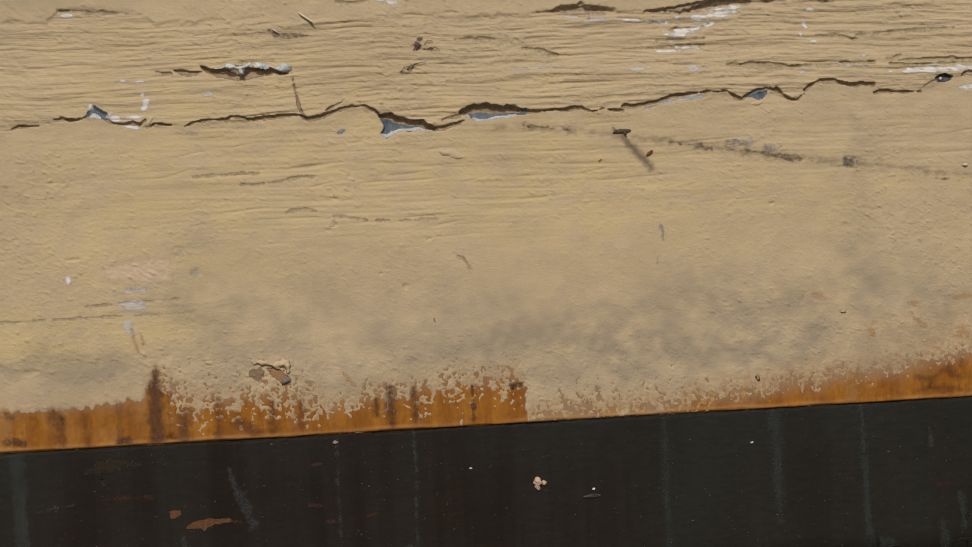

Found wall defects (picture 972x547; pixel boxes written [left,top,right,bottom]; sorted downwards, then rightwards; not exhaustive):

crack [335,0,368,8]
peeling [200,62,292,81]
crack [11,77,379,131]
spalling [459,103,527,121]
spalling [377,112,438,139]
crack [430,114,465,131]